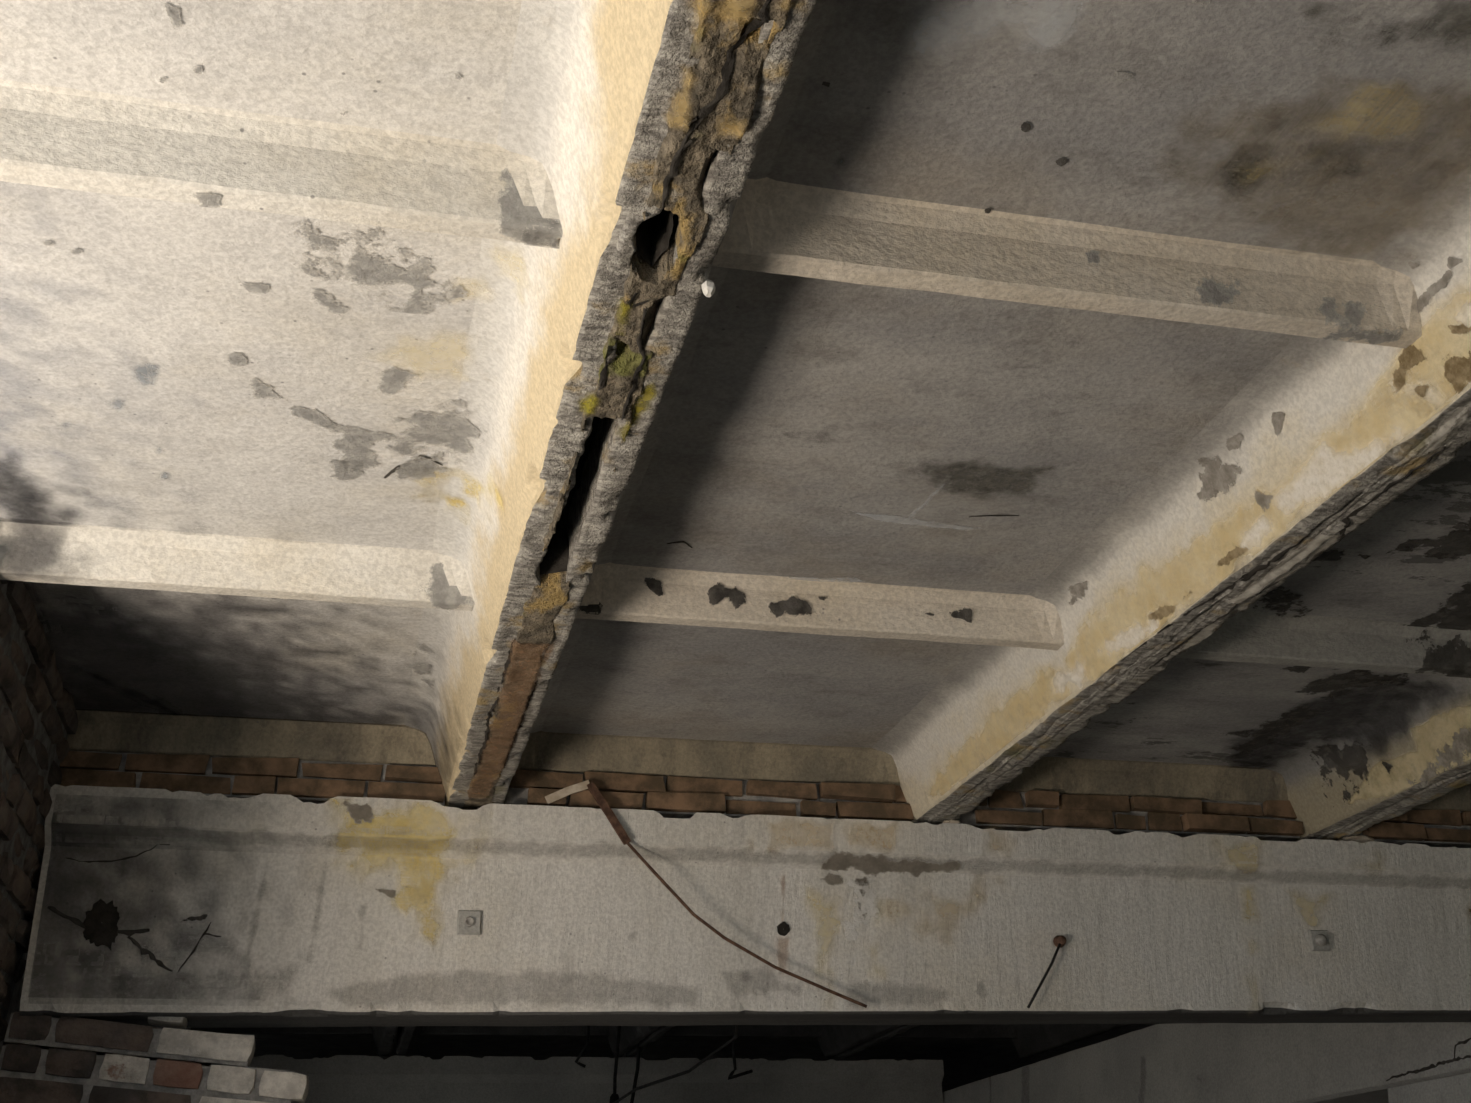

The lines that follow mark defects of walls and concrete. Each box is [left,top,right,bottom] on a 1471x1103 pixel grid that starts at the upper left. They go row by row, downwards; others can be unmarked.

peeling [497,168,563,249]
spalling [634,209,673,267]
spalling [701,279,715,297]
peeling [1317,296,1471,397]
spalling [540,417,600,575]
damp [932,296,1471,803]
peeling [707,582,746,609]
peeling [768,596,826,618]
peeling [1228,517,1471,759]
damp [339,806,451,937]
crack [48,906,221,972]
crack [1386,1038,1471,1081]